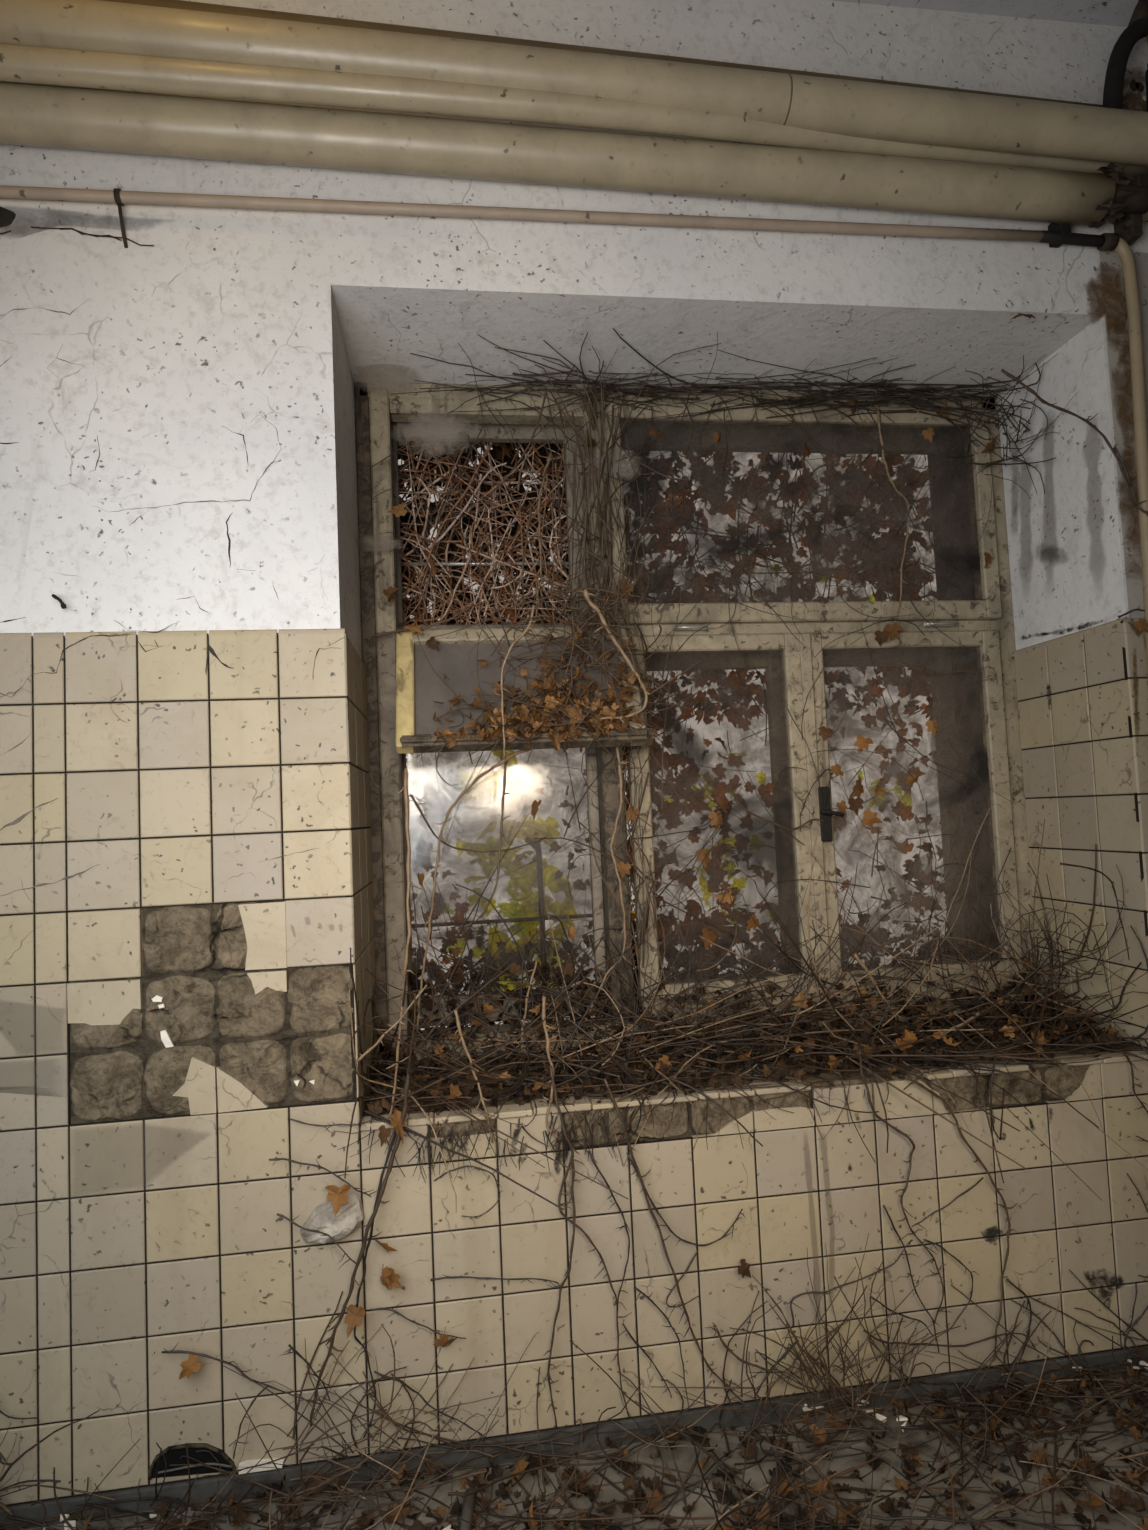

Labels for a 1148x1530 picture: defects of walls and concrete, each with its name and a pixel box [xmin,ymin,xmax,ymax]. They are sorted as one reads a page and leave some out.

crack [0,299,89,374]
crack [90,414,282,600]
leakage [1022,622,1093,640]
spalling [67,900,360,1124]